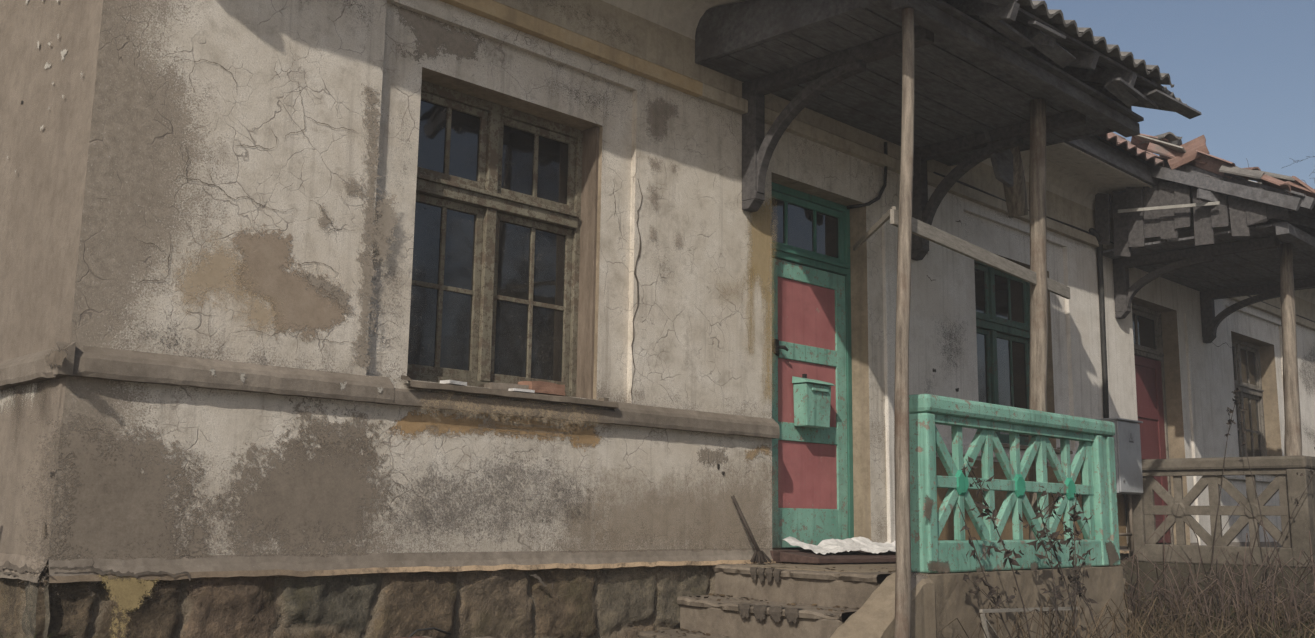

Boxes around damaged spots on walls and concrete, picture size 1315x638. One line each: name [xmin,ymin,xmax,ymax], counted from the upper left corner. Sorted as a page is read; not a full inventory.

peeling [393,5,485,61]
crack [235,61,359,149]
crack [135,234,171,285]
crack [172,148,352,232]
peeling [176,82,405,372]
crack [613,180,643,397]
peeling [389,391,602,452]
damp [0,383,588,595]
damp [109,607,130,638]